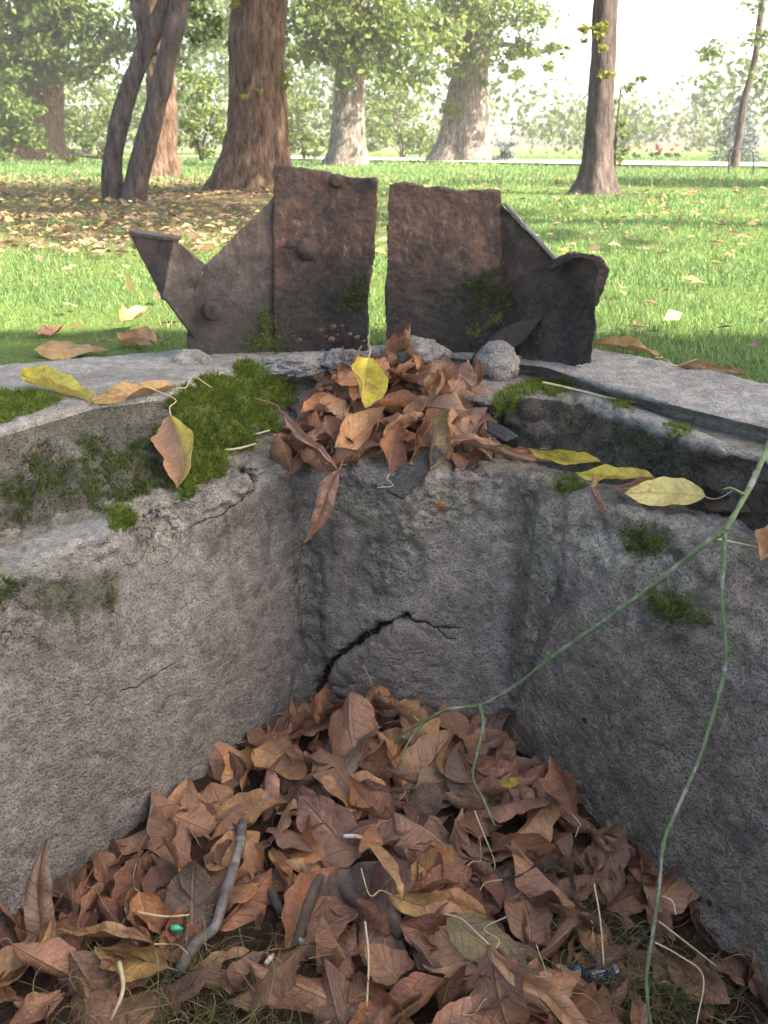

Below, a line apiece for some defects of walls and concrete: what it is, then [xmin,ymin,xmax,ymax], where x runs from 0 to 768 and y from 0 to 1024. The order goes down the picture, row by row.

crack [174,465,255,534]
crack [315,612,461,694]